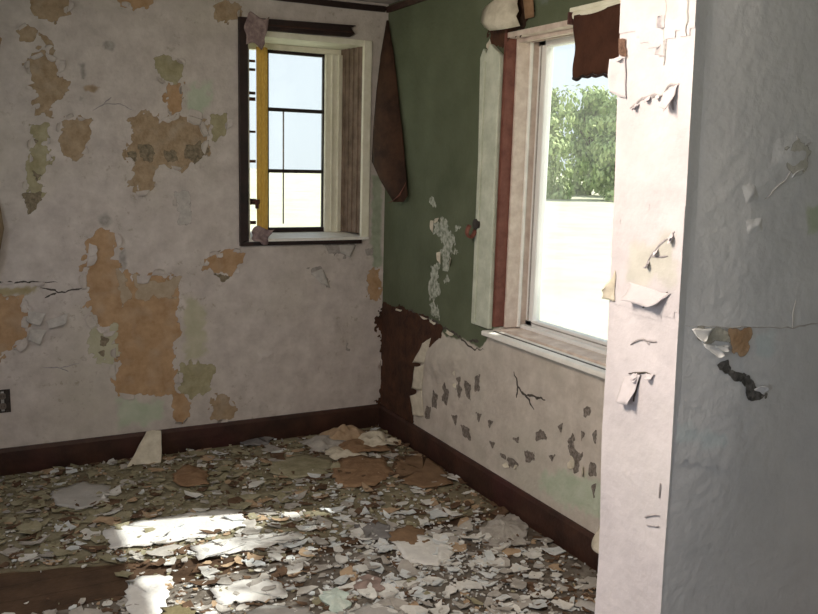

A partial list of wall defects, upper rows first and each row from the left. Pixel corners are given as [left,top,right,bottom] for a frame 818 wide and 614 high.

peeling [16,0,93,214]
peeling [122,54,233,196]
peeling [201,248,245,282]
peeling [0,293,32,363]
peeling [78,228,238,425]
peeling [366,217,461,423]
flaking render [425,371,480,419]
flaking render [451,415,471,441]
flaking render [489,441,535,469]
crack [514,374,545,409]
flaking render [567,430,597,498]
peeling [692,326,770,401]